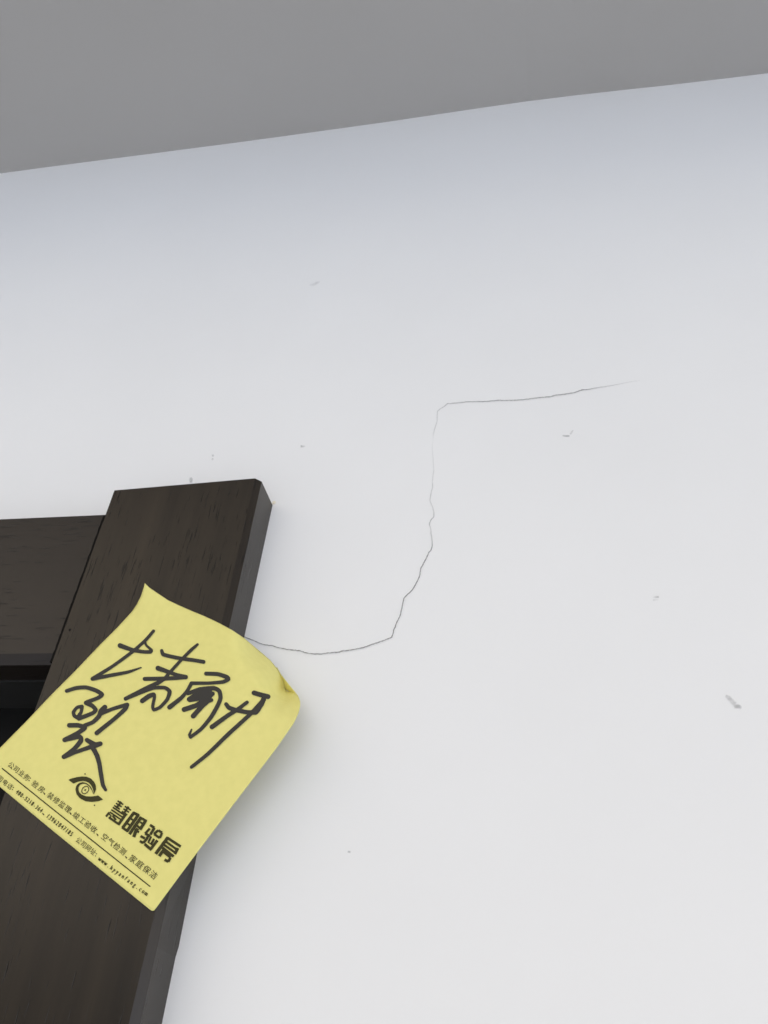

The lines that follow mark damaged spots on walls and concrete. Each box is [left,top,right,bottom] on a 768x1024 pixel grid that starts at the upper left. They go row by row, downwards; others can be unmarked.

crack [244,544,433,654]